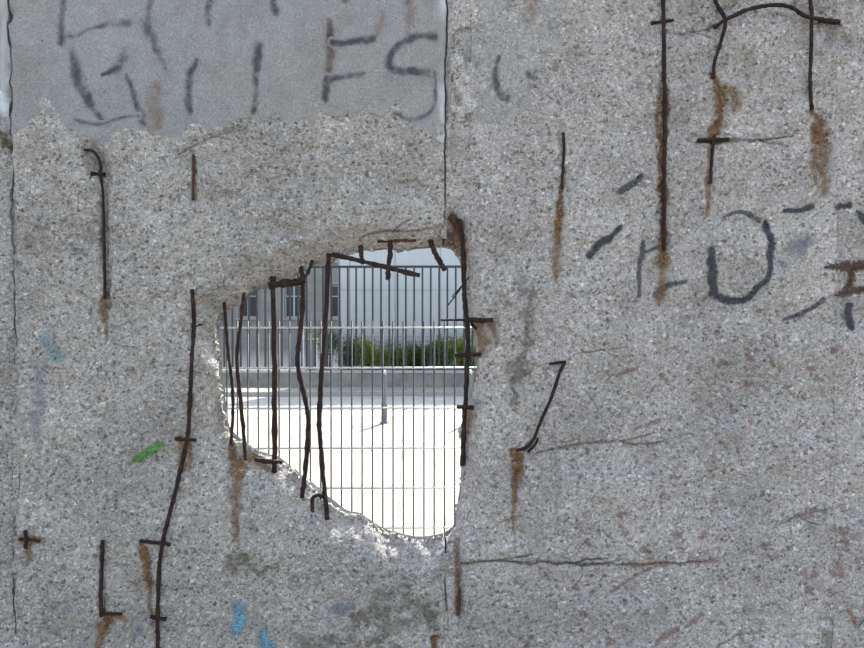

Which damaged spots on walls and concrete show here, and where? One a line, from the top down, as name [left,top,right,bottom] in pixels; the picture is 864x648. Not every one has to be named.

leakage [0,89,13,114]
rust [655,71,670,306]
rust [704,72,741,216]
rust [809,109,831,195]
rust [553,185,564,282]
rust [98,292,109,338]
spalling [0,97,447,648]
rust [228,441,270,542]
rust [509,447,524,531]
rust [139,543,153,615]
rust [454,538,462,616]
crack [509,554,608,567]